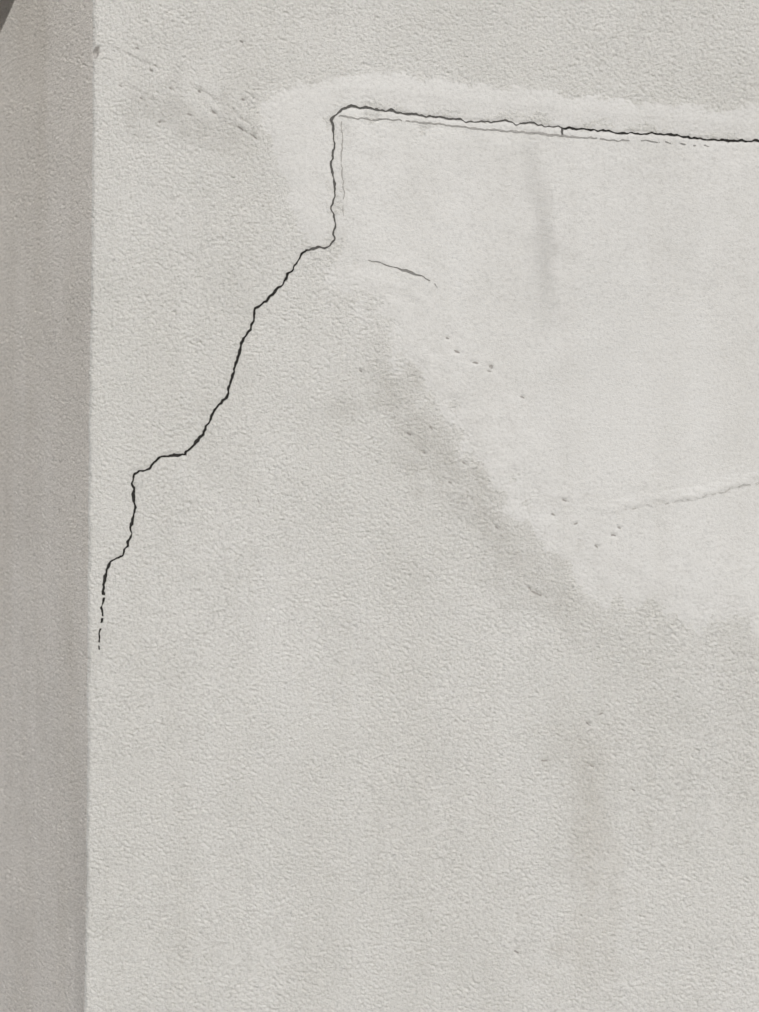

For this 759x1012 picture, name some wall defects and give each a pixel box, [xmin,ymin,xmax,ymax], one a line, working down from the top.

crack [98,104,759,650]